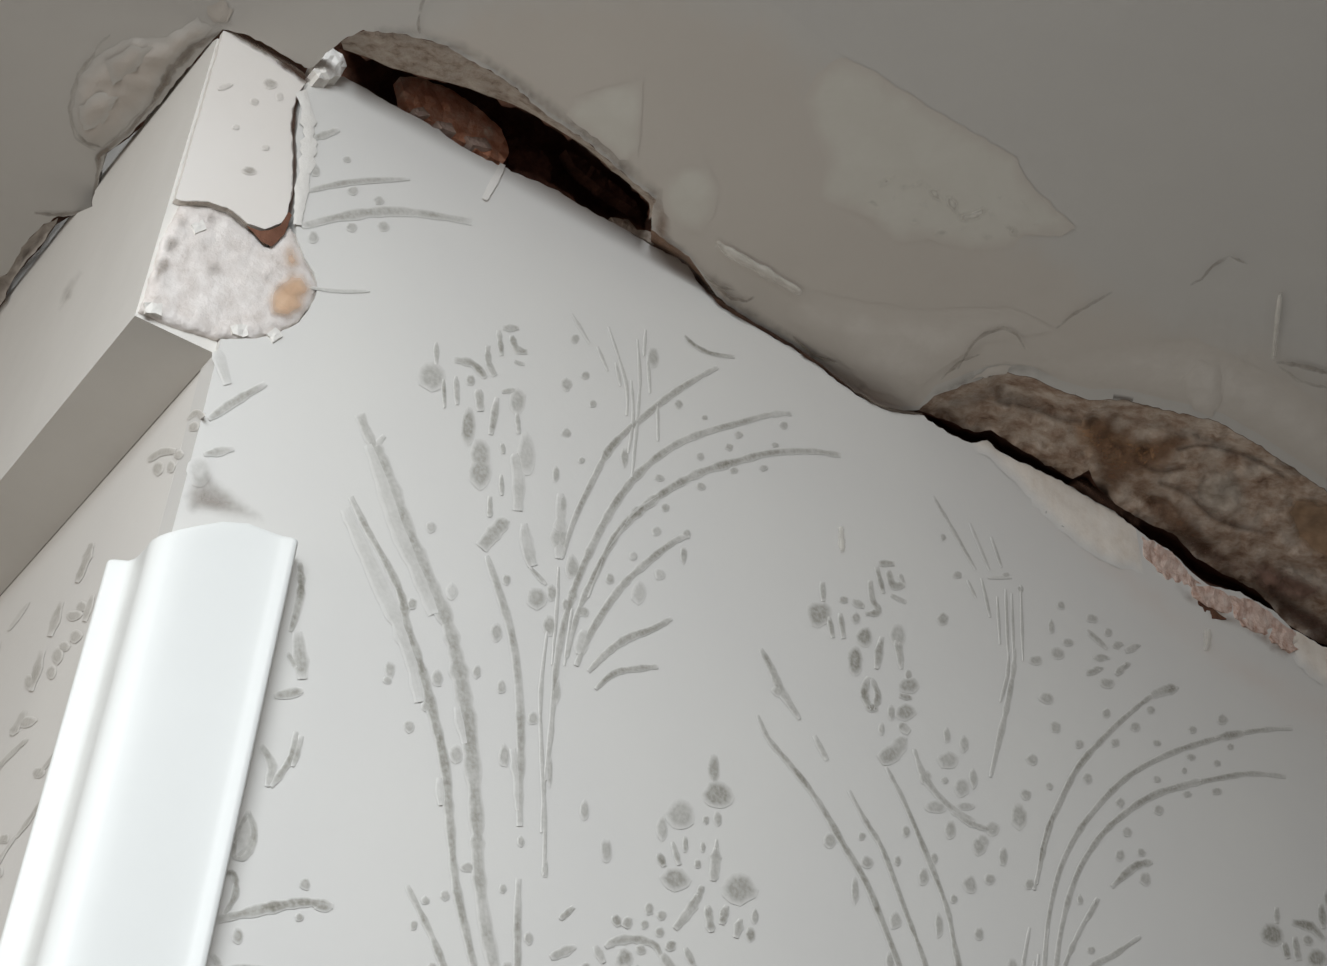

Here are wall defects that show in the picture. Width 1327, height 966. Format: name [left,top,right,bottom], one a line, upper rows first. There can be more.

spalling [0,218,58,305]
spalling [72,0,317,343]
spalling [341,31,720,234]
crack [651,228,920,415]
spalling [786,286,1327,688]